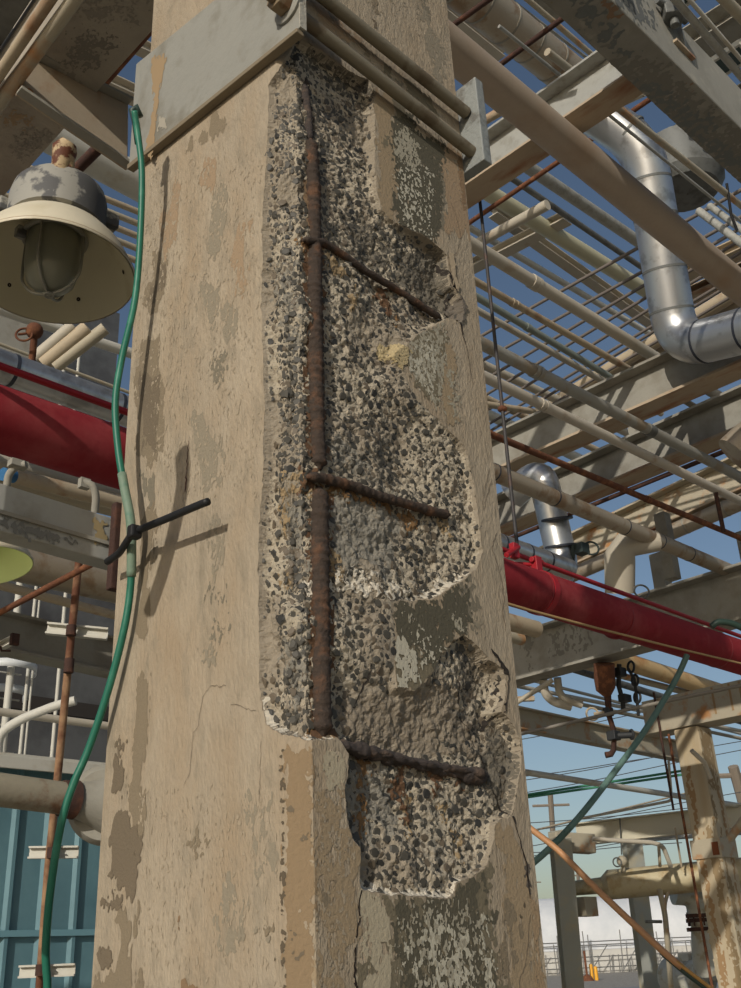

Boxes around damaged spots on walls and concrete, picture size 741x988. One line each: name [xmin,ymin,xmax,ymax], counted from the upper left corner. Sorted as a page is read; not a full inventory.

corrosion [277,179,422,739]
spalling [258,38,522,988]
crack [353,890,362,988]
corrosion [352,745,487,864]
crack [457,533,531,988]